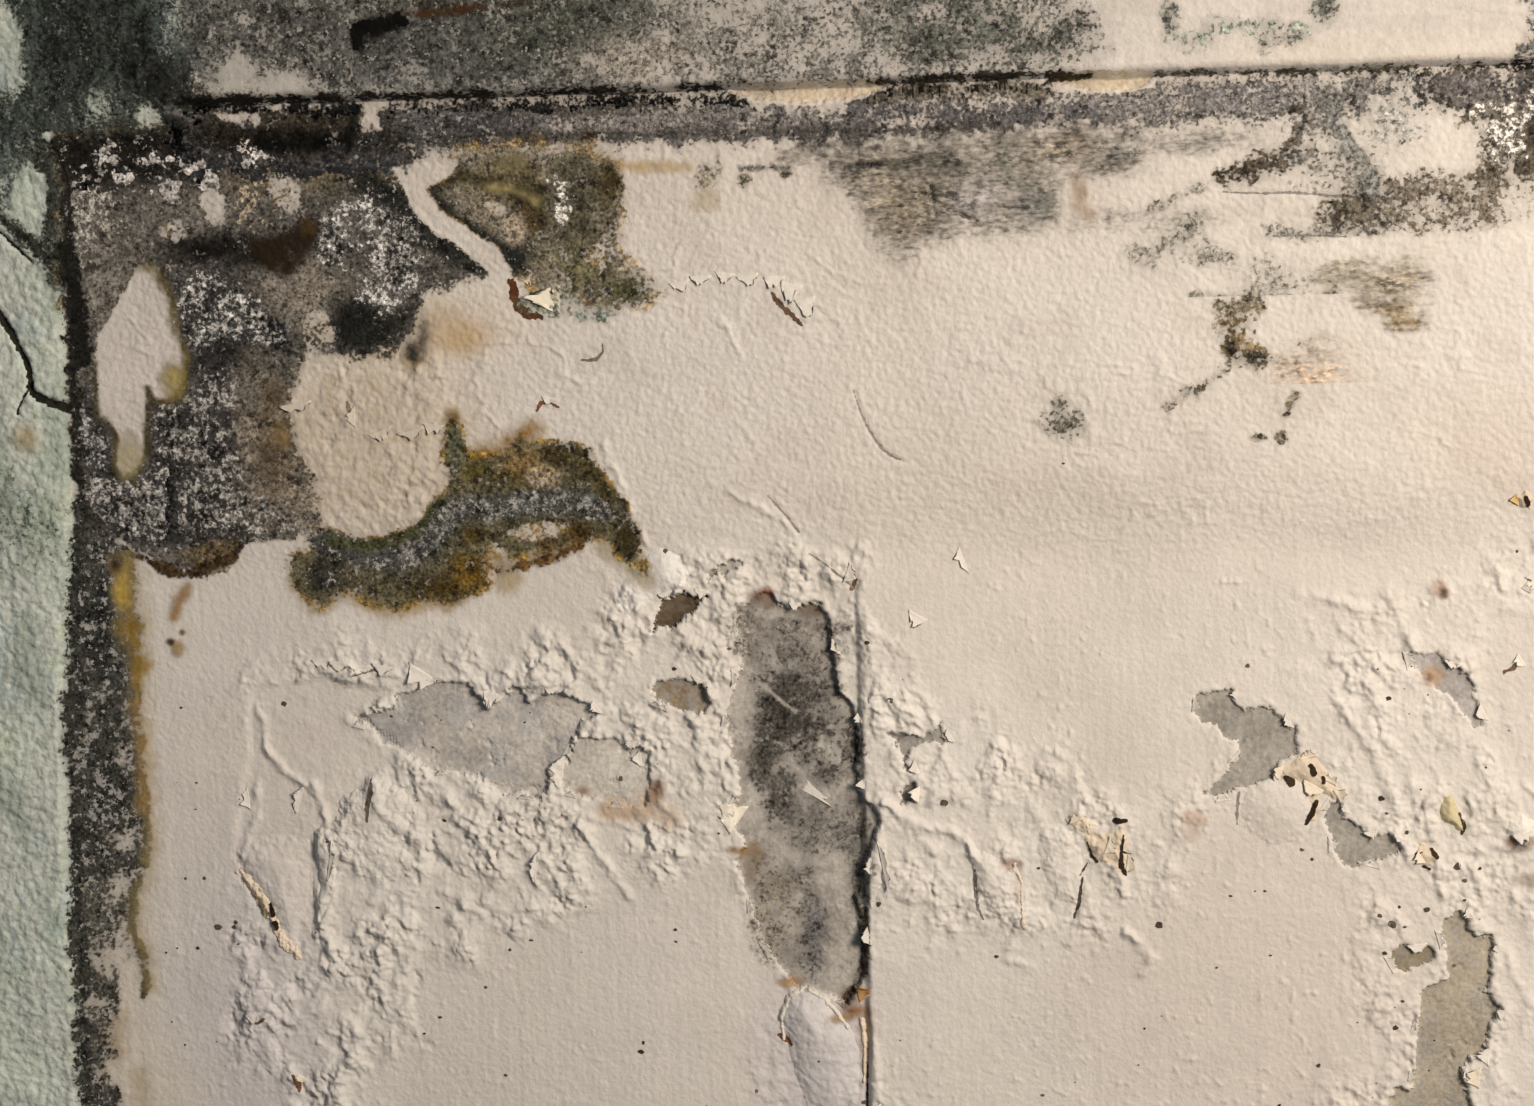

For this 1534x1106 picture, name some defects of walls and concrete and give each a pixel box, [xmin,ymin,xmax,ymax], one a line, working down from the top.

damp [792,0,1534,249]
crack [0,231,32,262]
crack [0,310,73,415]
damp [1041,395,1084,438]
damp [0,0,939,1106]
peeling [652,559,743,633]
peeling [311,658,651,809]
peeling [649,592,881,1008]
peeling [1191,688,1439,871]
peeling [1403,651,1488,729]
crack [863,1030,871,1106]
peeling [1383,908,1507,1106]